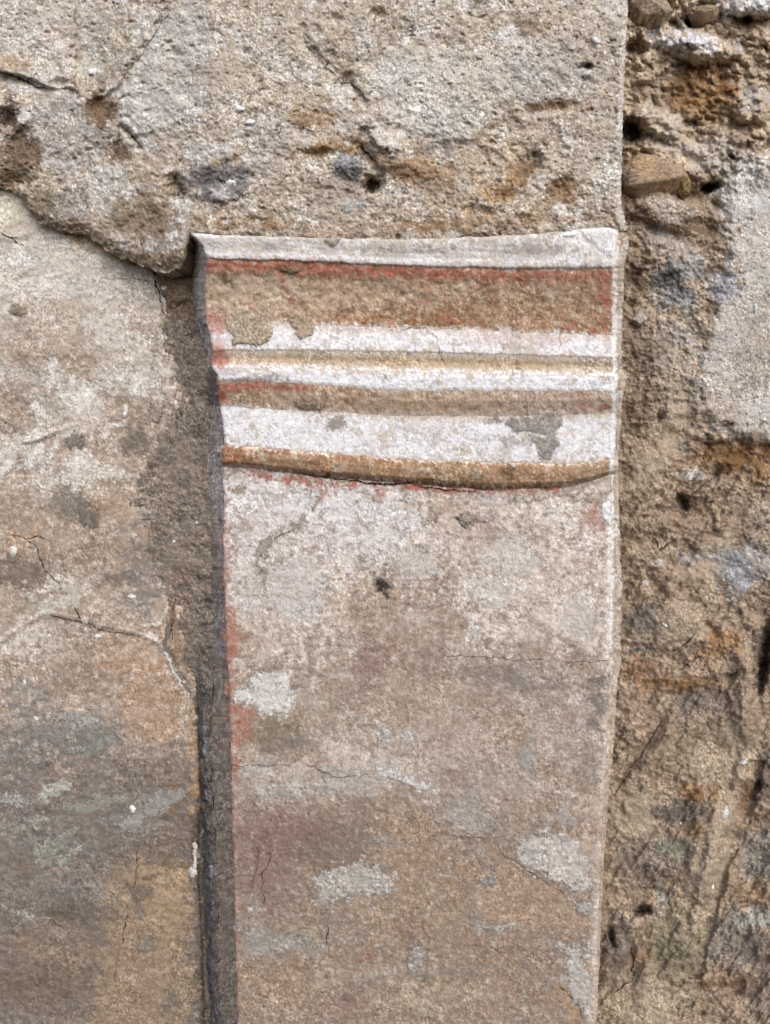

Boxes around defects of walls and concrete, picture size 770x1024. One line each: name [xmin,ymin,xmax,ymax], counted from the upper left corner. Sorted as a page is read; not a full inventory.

crack [0,72,45,89]
crack [0,531,193,721]